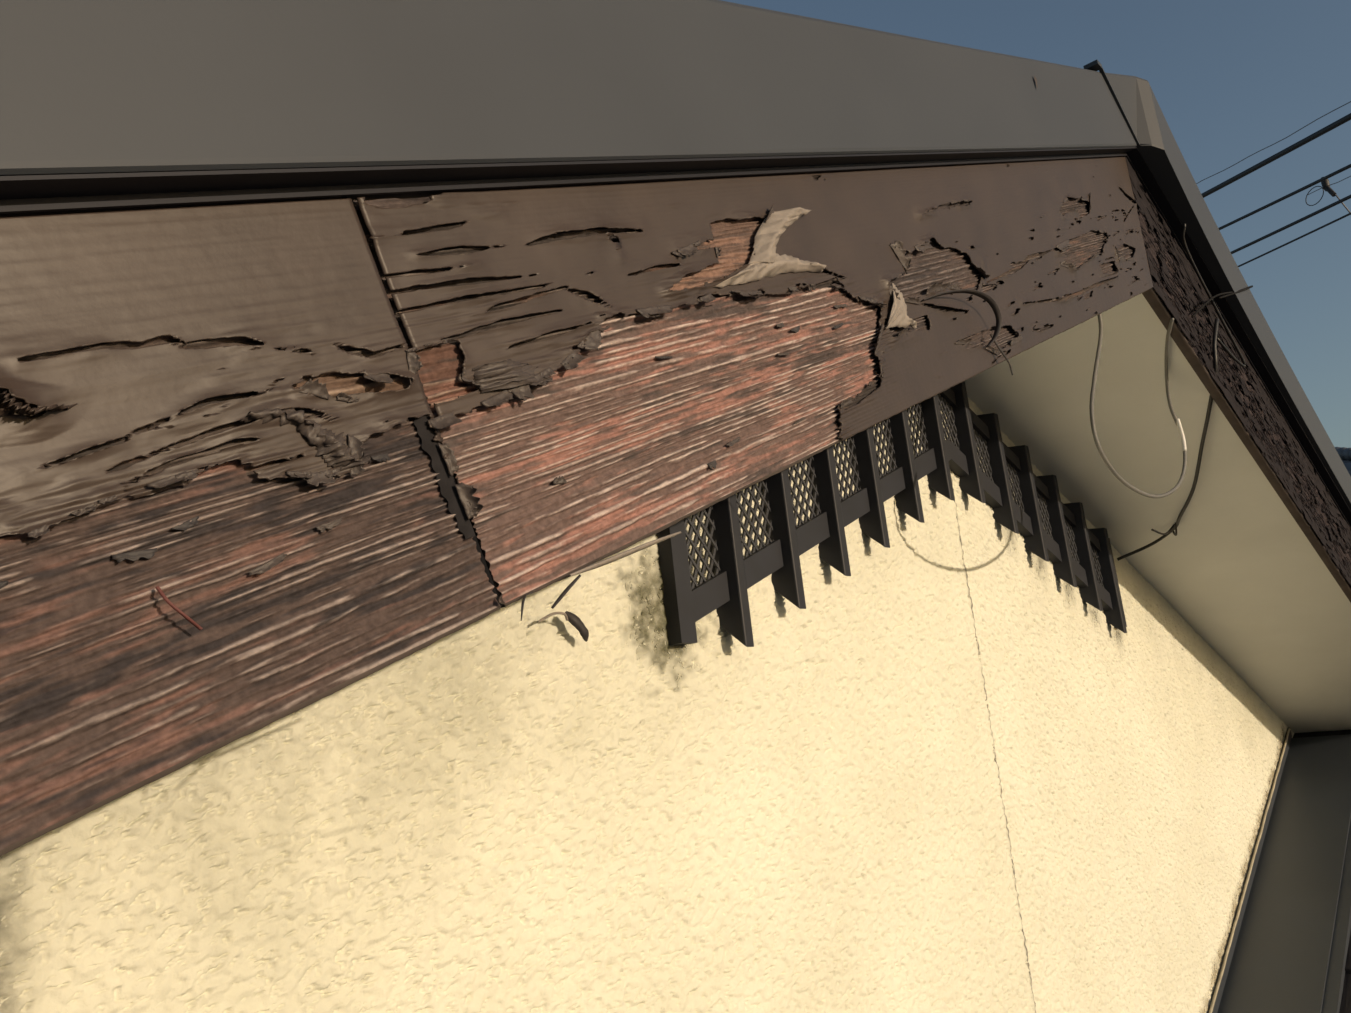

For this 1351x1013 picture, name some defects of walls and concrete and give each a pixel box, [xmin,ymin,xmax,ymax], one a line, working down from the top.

damp [631,558,684,669]
peeling [0,192,1351,850]